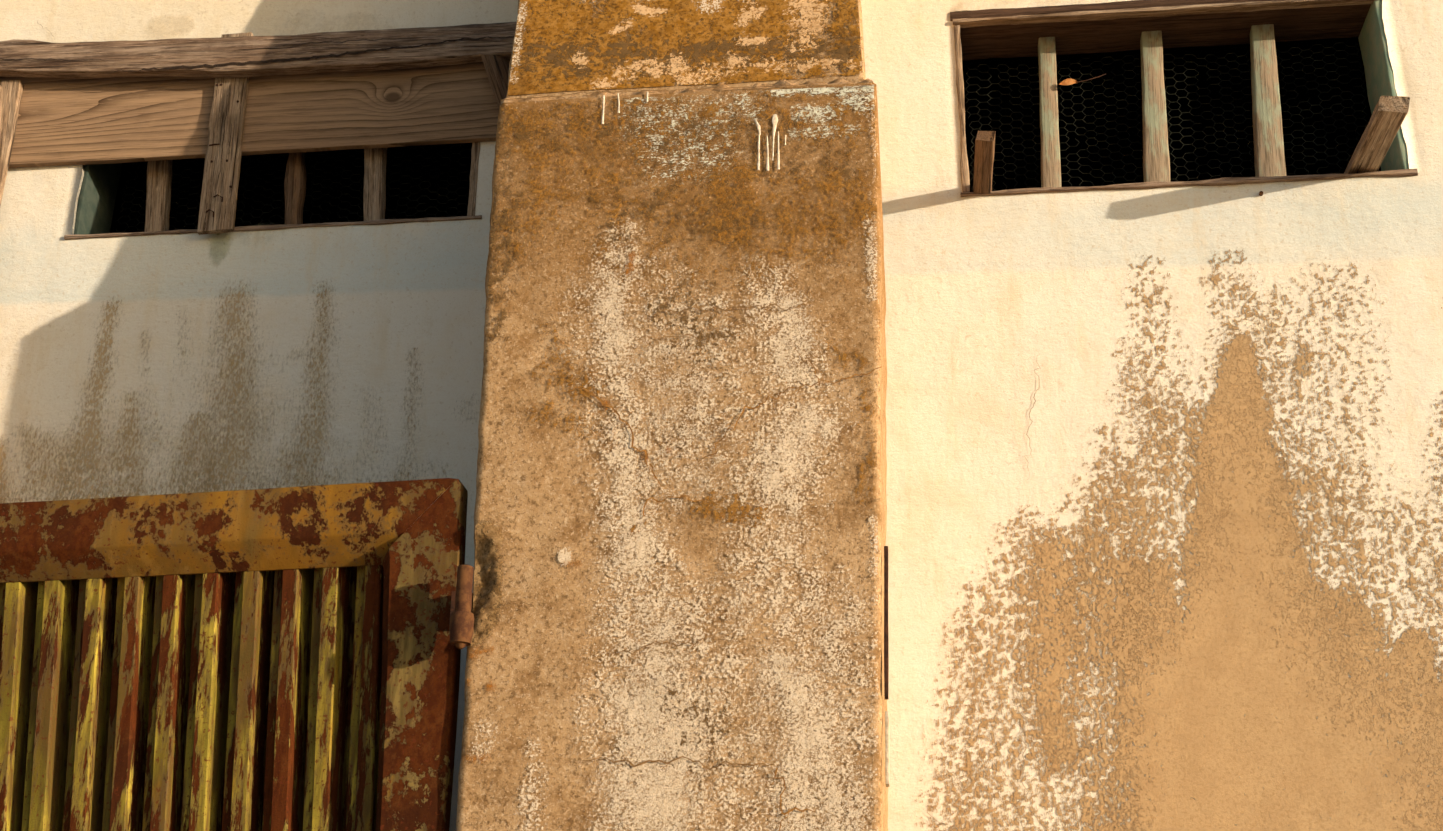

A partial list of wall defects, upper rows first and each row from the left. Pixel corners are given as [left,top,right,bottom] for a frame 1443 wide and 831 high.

water stain [485,93,864,352]
water stain [642,267,750,377]
crack [628,303,813,341]
water stain [0,287,340,503]
crack [562,387,708,516]
crack [698,346,882,462]
crack [620,637,723,653]
water stain [657,671,737,777]
crack [568,756,815,831]